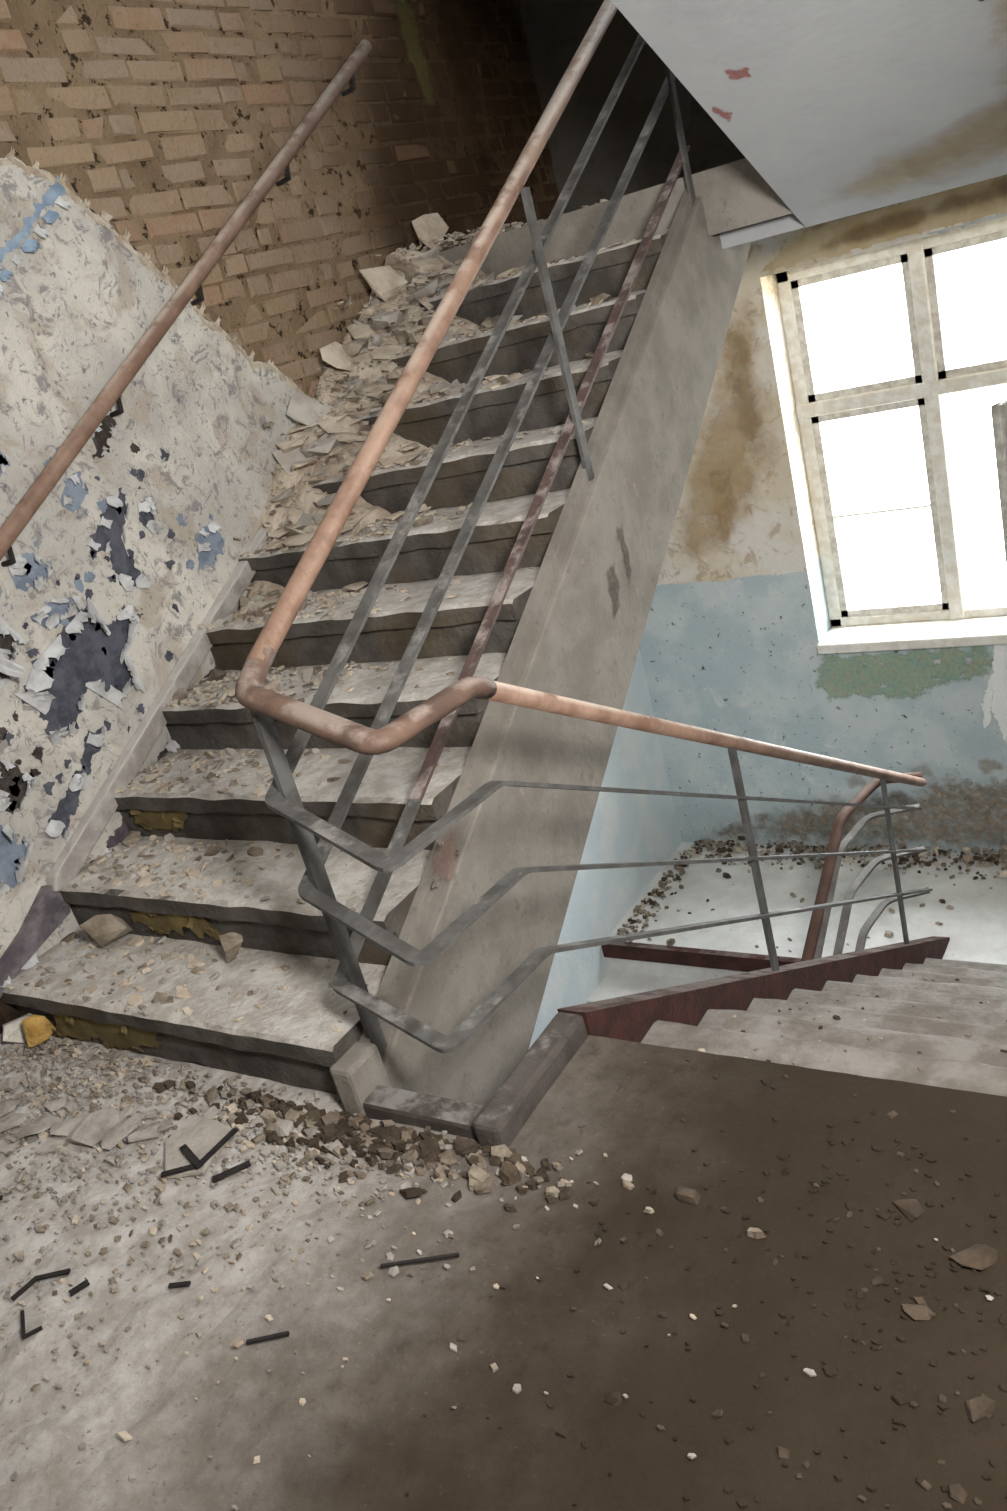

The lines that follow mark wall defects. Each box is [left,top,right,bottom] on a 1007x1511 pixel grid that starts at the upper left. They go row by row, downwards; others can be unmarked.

leakage [689,324,762,548]
peeling [0,409,227,896]
peeling [817,646,994,699]
peeling [129,911,222,940]
spalling [0,952,39,1034]